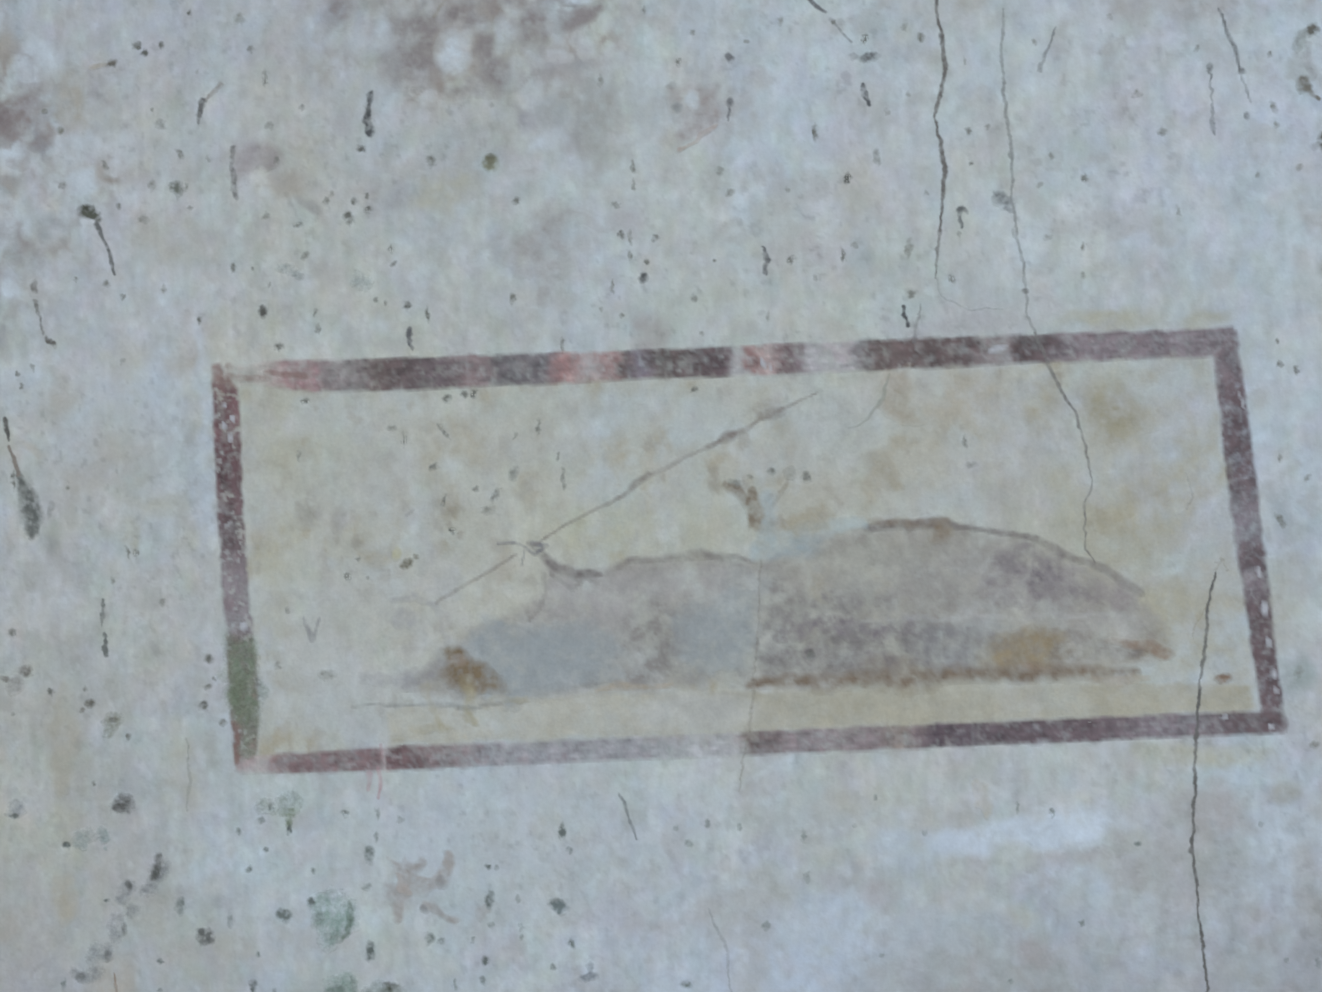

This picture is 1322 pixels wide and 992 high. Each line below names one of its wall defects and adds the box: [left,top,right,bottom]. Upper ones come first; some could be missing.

crack [911,0,1096,563]
crack [1187,556,1229,992]